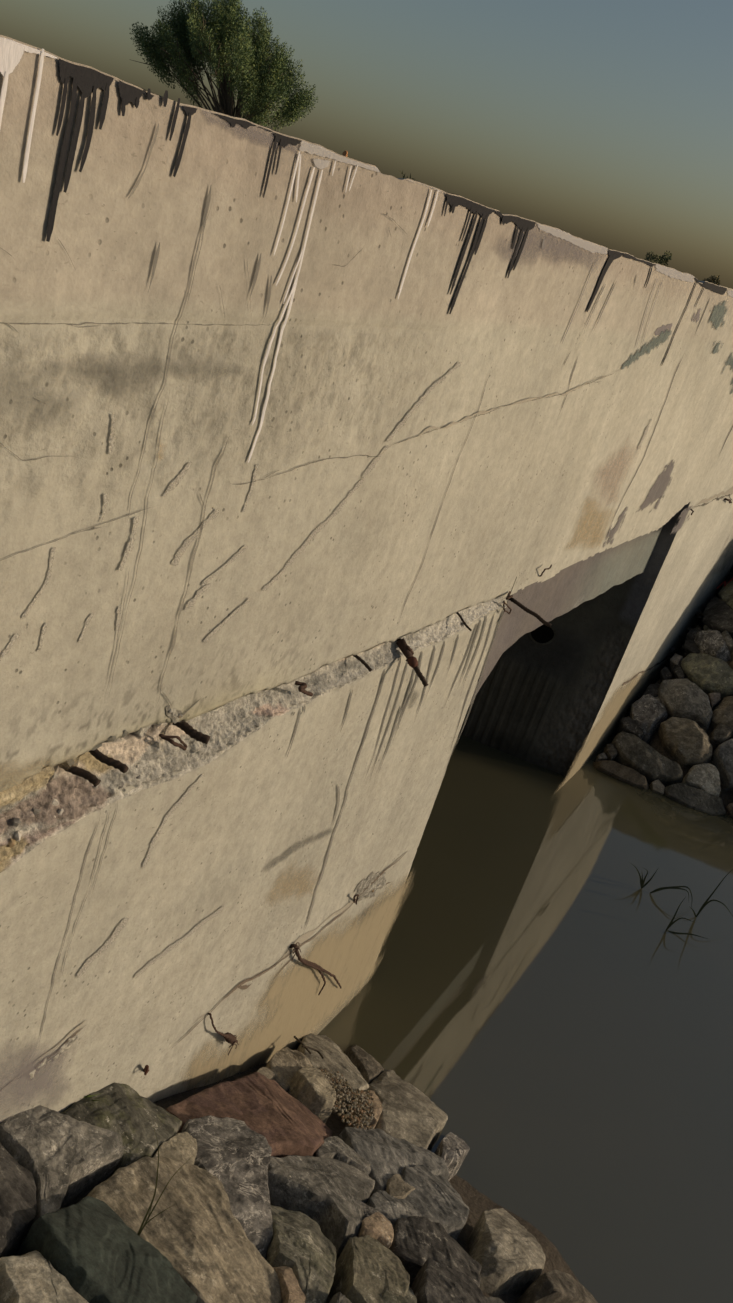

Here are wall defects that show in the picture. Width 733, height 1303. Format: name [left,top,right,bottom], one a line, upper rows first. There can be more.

damp [0,71,9,128]
damp [23,49,44,183]
damp [46,78,192,242]
damp [234,125,358,463]
damp [398,190,616,343]
damp [661,281,710,366]
crack [612,355,684,522]
crack [158,351,619,715]
spalling [0,596,552,873]
damp [352,610,503,778]